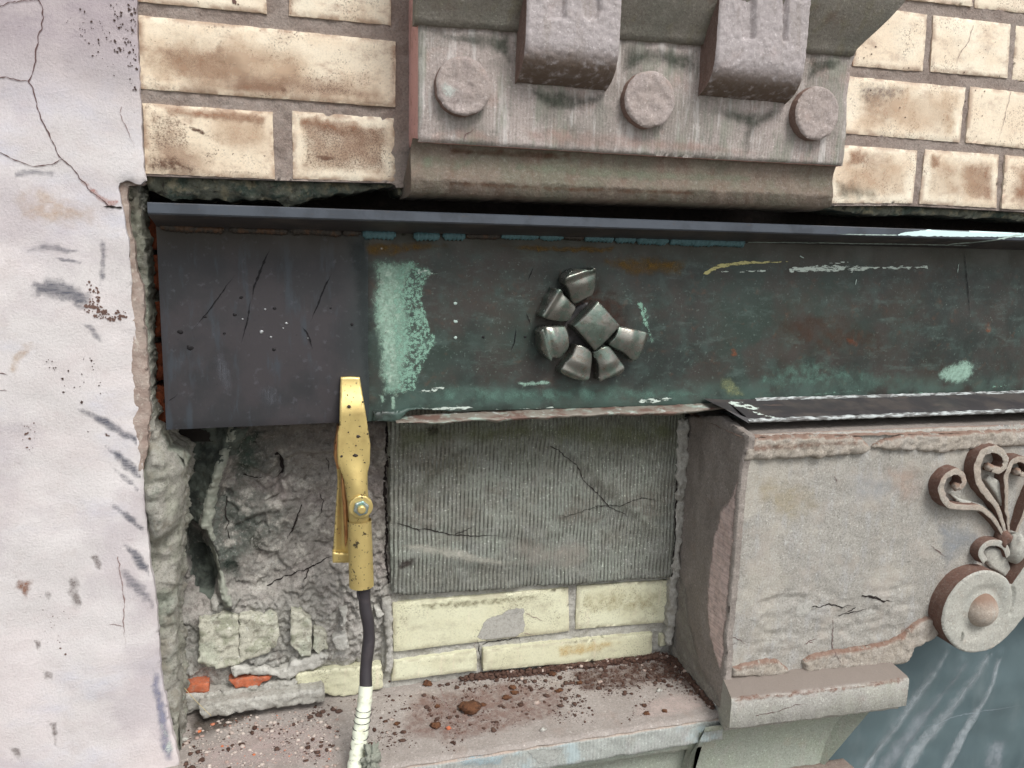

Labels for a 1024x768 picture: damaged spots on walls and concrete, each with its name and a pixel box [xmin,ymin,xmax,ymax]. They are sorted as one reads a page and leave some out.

crack [0,0,122,208]
water stain [369,245,433,409]
crack [550,446,653,532]
crack [397,523,511,539]
crack [267,557,329,586]
spalling [186,594,350,693]
spalling [295,660,383,696]
spalling [478,608,525,640]
crack [806,595,889,666]